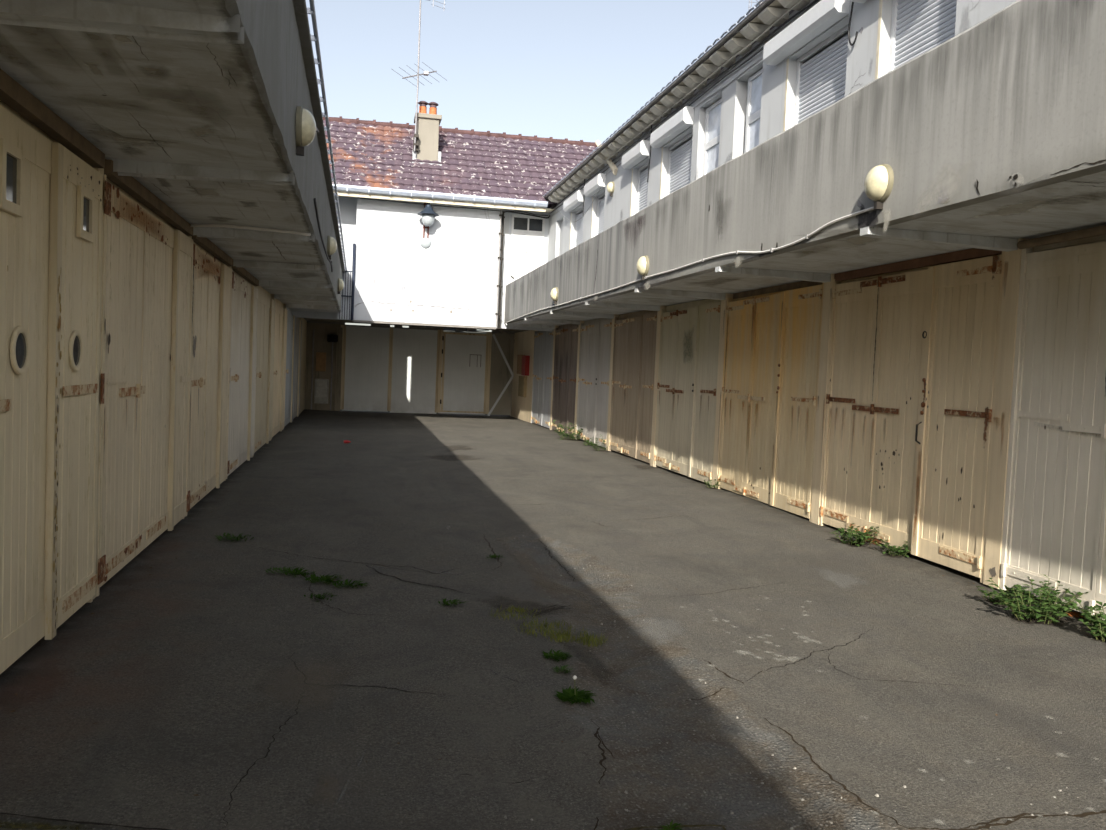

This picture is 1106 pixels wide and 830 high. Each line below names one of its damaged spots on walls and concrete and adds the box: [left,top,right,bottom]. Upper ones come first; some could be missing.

crack [219,657,448,830]
crack [765,718,1106,830]